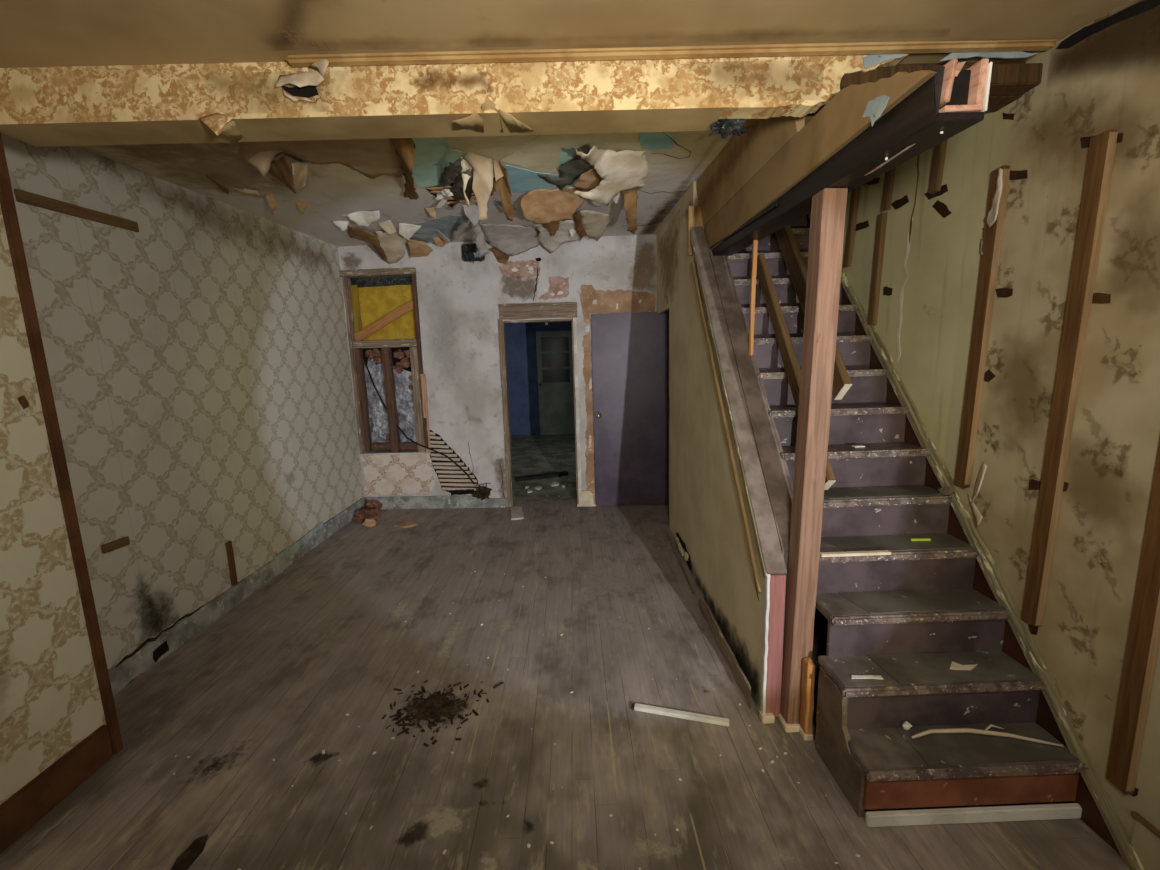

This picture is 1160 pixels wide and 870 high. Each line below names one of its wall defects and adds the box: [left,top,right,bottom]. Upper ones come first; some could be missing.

flaking render [412,137,462,187]
flaking render [501,132,676,193]
flaking render [410,215,480,243]
flaking render [499,257,656,504]
mould [141,588,175,637]